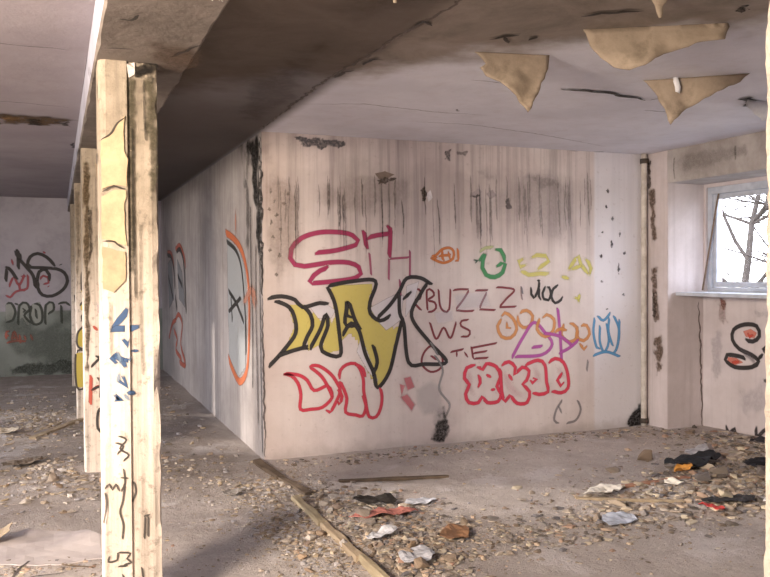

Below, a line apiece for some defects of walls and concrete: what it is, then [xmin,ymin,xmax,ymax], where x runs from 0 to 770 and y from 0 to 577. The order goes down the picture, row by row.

flaking render [583,0,730,70]
flaking render [475,52,549,112]
flaking render [643,73,750,125]
flaking render [738,97,768,122]
crack [696,302,704,426]